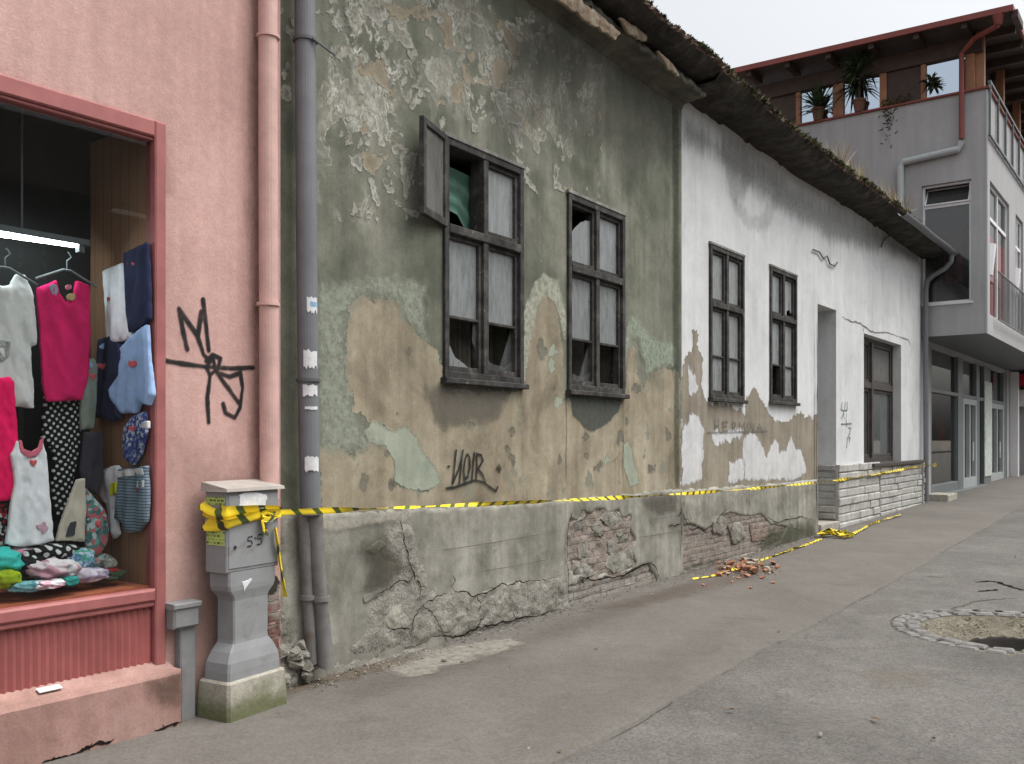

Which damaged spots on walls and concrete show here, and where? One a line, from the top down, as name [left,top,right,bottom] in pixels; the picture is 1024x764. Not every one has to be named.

spalling [553,0,647,42]
peeling [316,0,603,222]
crack [847,319,911,345]
peeling [320,293,818,642]
crack [373,499,733,639]
spalling [333,648,425,675]